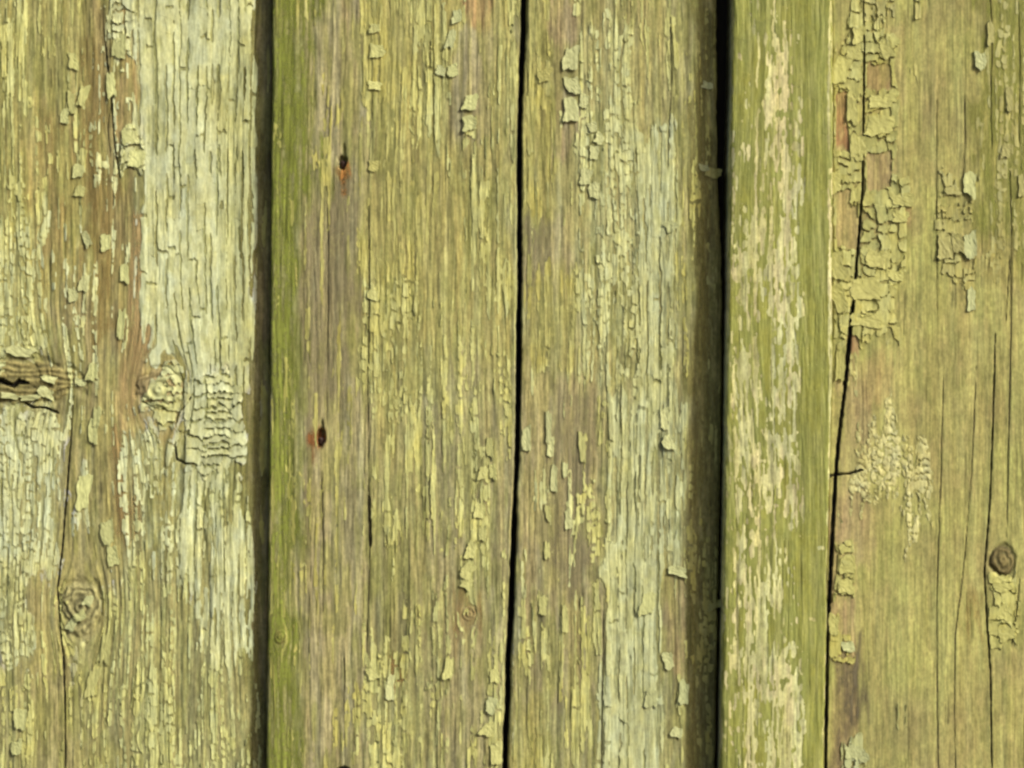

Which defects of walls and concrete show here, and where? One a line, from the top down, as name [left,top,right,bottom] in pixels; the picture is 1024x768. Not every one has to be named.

crack [859,0,867,135]
peeling [831,0,916,381]
peeling [935,0,1024,312]
crack [0,380,73,768]
peeling [0,0,307,768]
corrosion [307,428,326,447]
peeling [352,0,806,768]
peeling [828,539,856,664]
crack [824,160,863,768]
peeling [848,397,934,561]
peeling [988,572,1021,650]